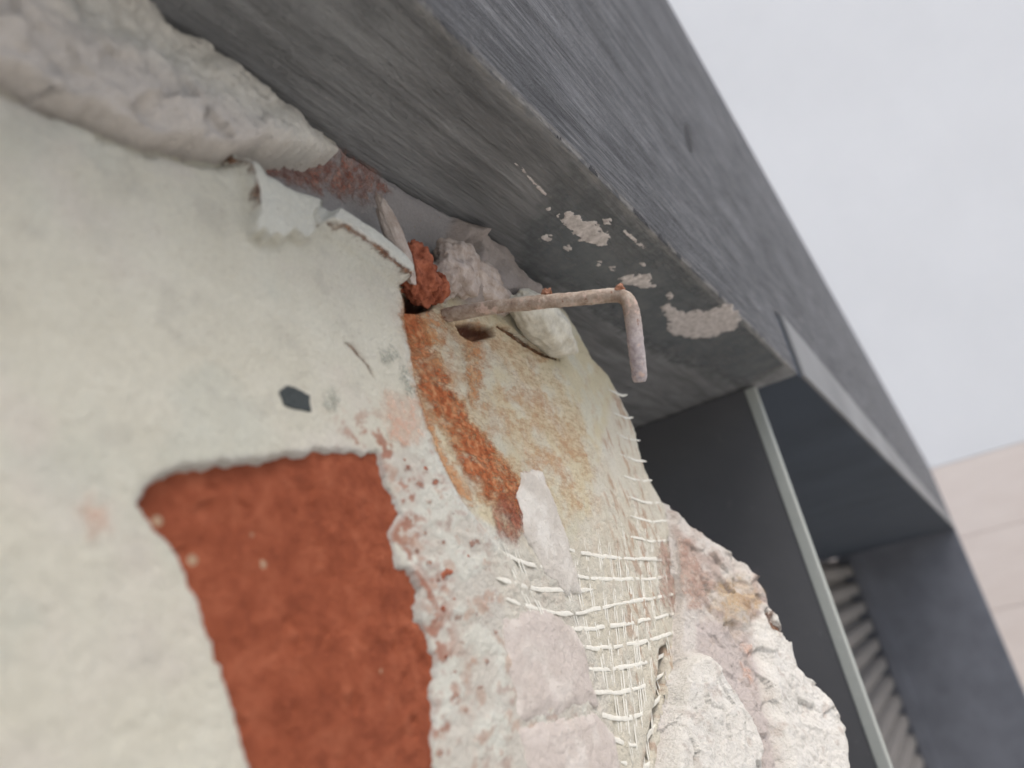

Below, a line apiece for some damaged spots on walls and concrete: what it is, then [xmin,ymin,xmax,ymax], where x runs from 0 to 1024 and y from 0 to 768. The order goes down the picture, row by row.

peeling [546,207,614,251]
peeling [596,261,656,288]
peeling [660,292,741,339]
corrosion [401,311,524,542]
peeling [515,469,582,596]
flaking render [137,451,448,768]
peeling [654,503,850,768]
peeling [519,712,621,768]